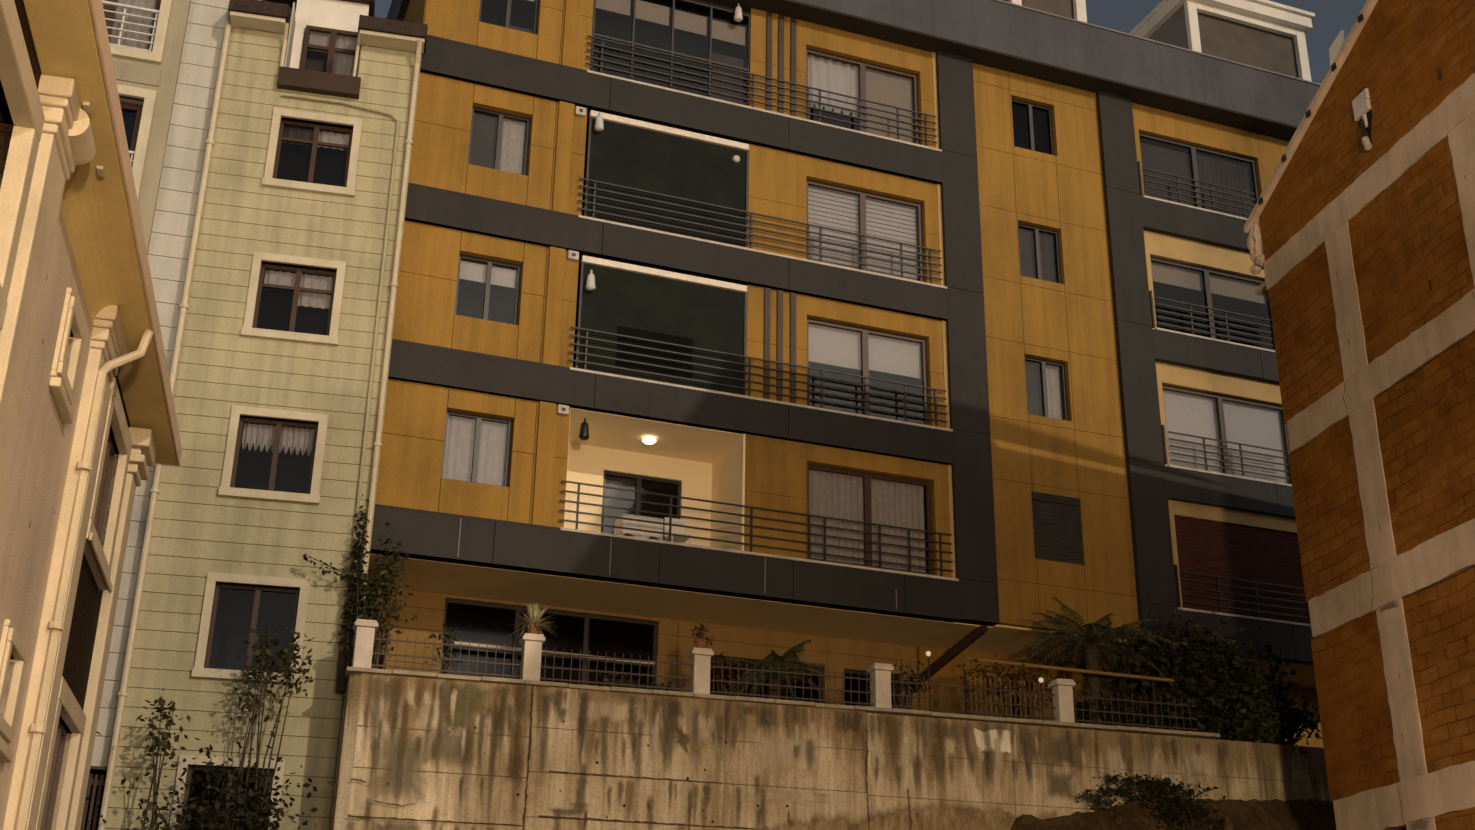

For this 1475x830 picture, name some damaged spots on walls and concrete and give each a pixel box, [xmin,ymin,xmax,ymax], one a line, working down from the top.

leakage [349,678,526,830]
leakage [543,692,820,830]
leakage [837,713,1228,798]